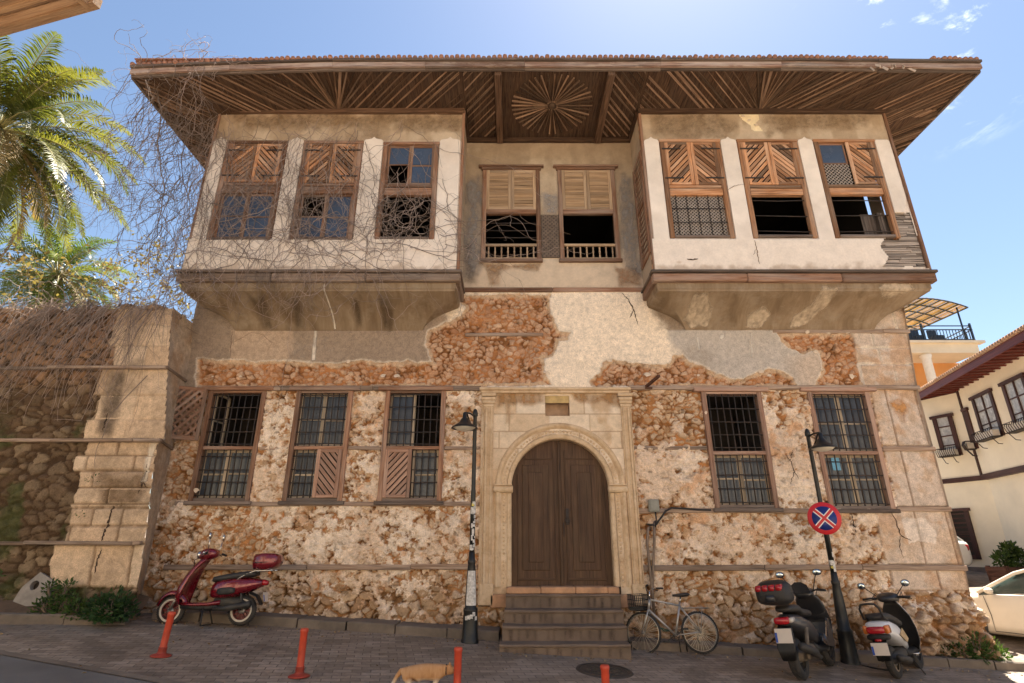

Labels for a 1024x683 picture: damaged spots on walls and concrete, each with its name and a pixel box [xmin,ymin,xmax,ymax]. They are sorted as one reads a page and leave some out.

spalling [860,213,926,268]
spalling [196,292,567,443]
spalling [590,287,863,505]
crack [95,506,115,572]